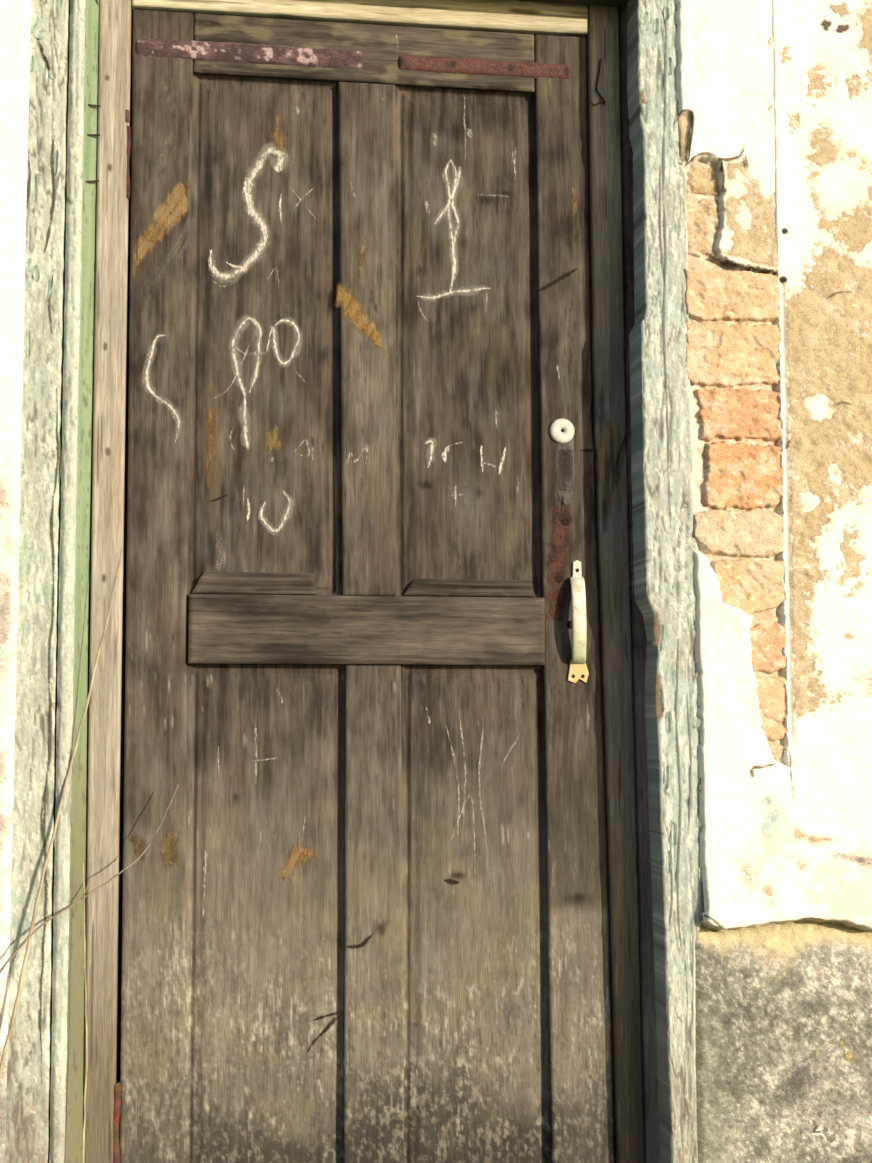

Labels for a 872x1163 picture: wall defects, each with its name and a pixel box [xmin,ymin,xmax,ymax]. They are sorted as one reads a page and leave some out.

peeling [806,2,872,108]
spalling [678,112,872,763]
rust [546,506,573,620]